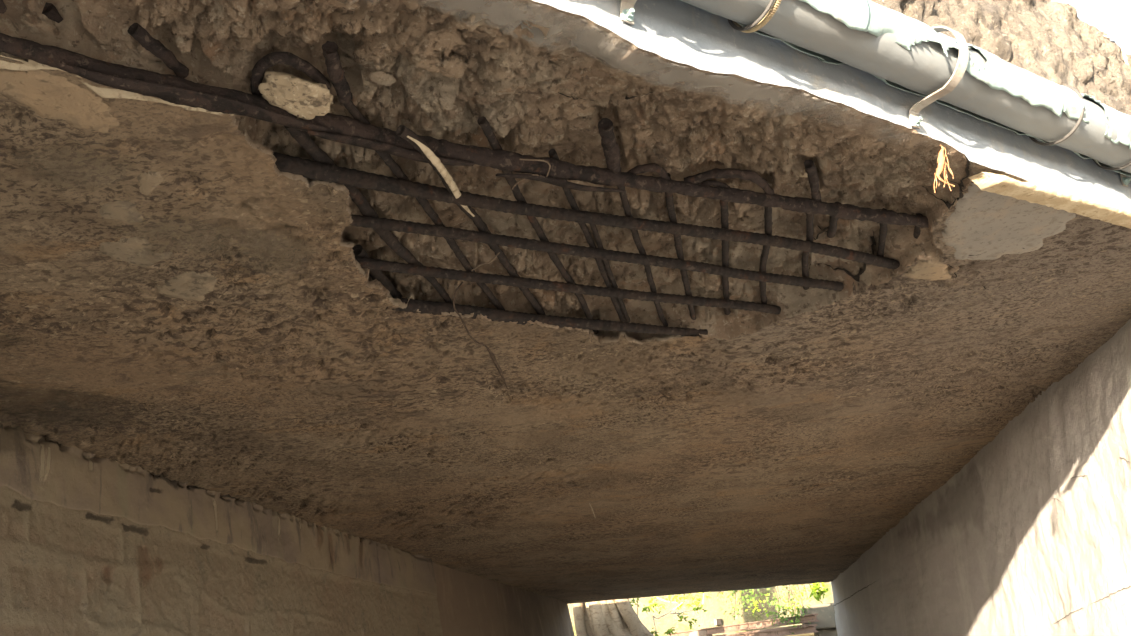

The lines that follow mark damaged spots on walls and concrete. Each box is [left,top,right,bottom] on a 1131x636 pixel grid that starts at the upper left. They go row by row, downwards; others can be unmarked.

spalling [0,0,1131,345]
crack [1053,586,1131,624]